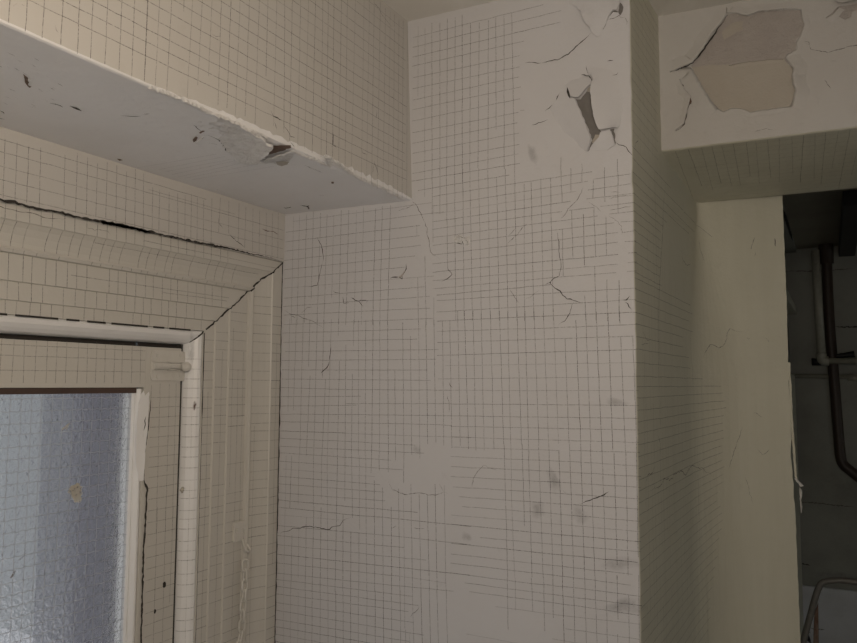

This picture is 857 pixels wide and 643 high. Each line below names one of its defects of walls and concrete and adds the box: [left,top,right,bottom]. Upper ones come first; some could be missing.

spalling [148,85,295,166]
crack [527,15,627,64]
peeling [549,66,623,151]
peeling [668,2,810,121]
crack [510,233,578,323]
crack [0,198,368,511]
crack [274,354,348,643]
crack [140,480,148,643]